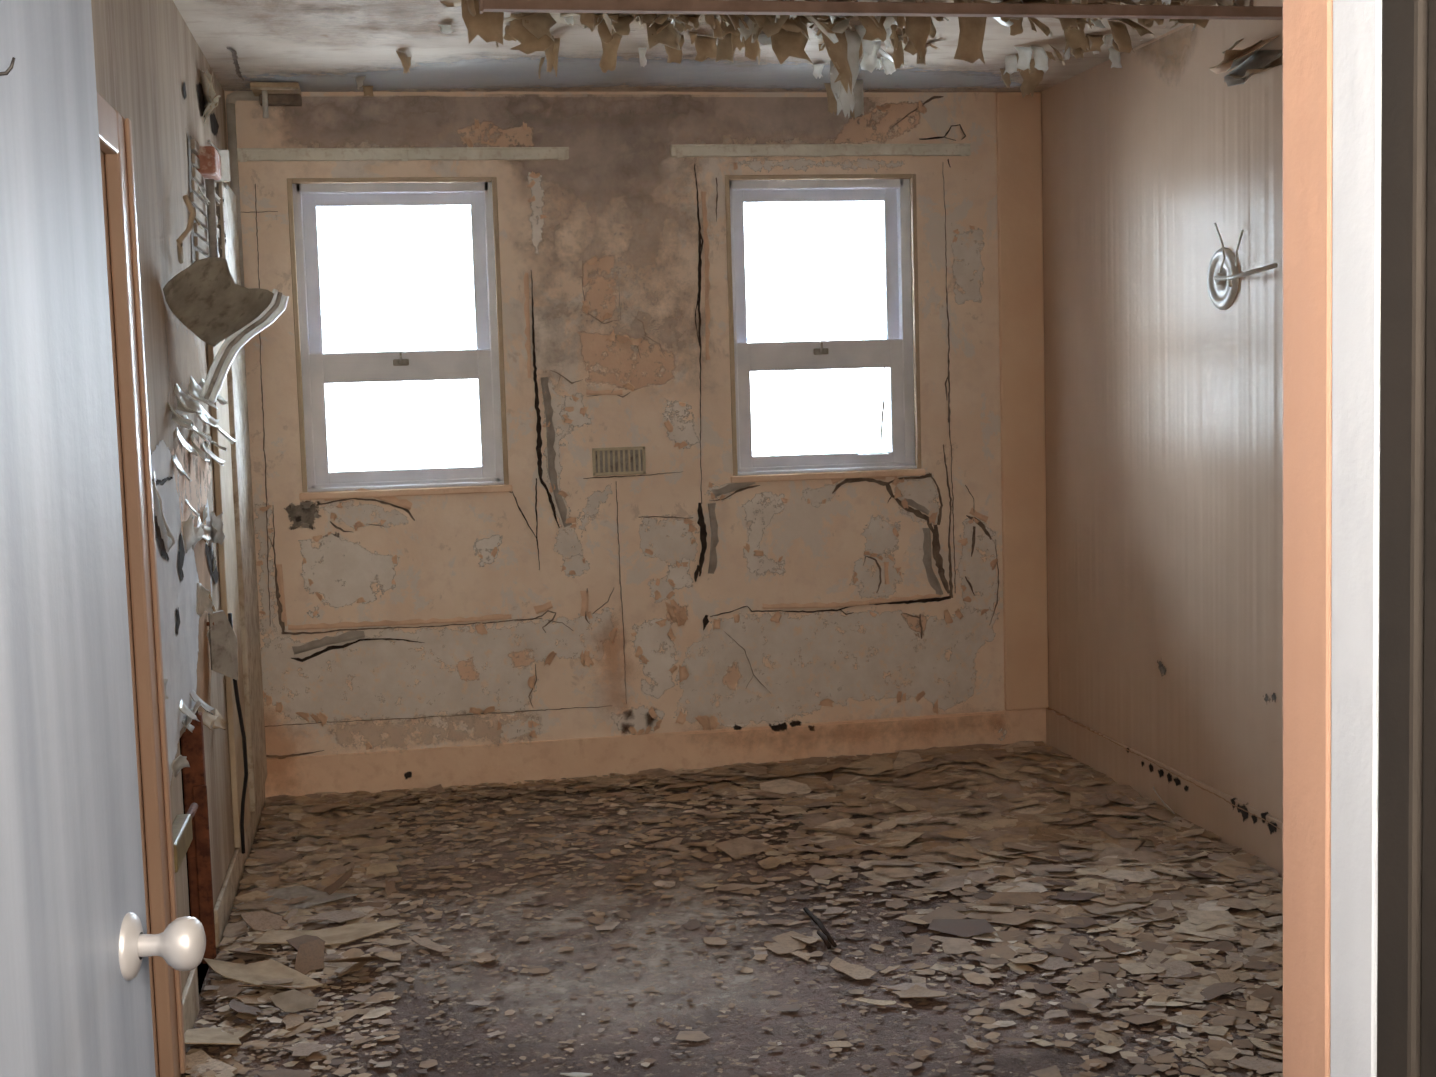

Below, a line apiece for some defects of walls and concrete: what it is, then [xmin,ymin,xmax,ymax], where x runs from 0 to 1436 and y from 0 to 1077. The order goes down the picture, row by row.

peeling [438,0,1249,147]
peeling [1209,35,1283,87]
crack [244,184,278,288]
peeling [527,172,547,254]
peeling [151,257,289,785]
crack [259,164,760,759]
peeling [541,380,612,578]
crack [703,96,999,688]